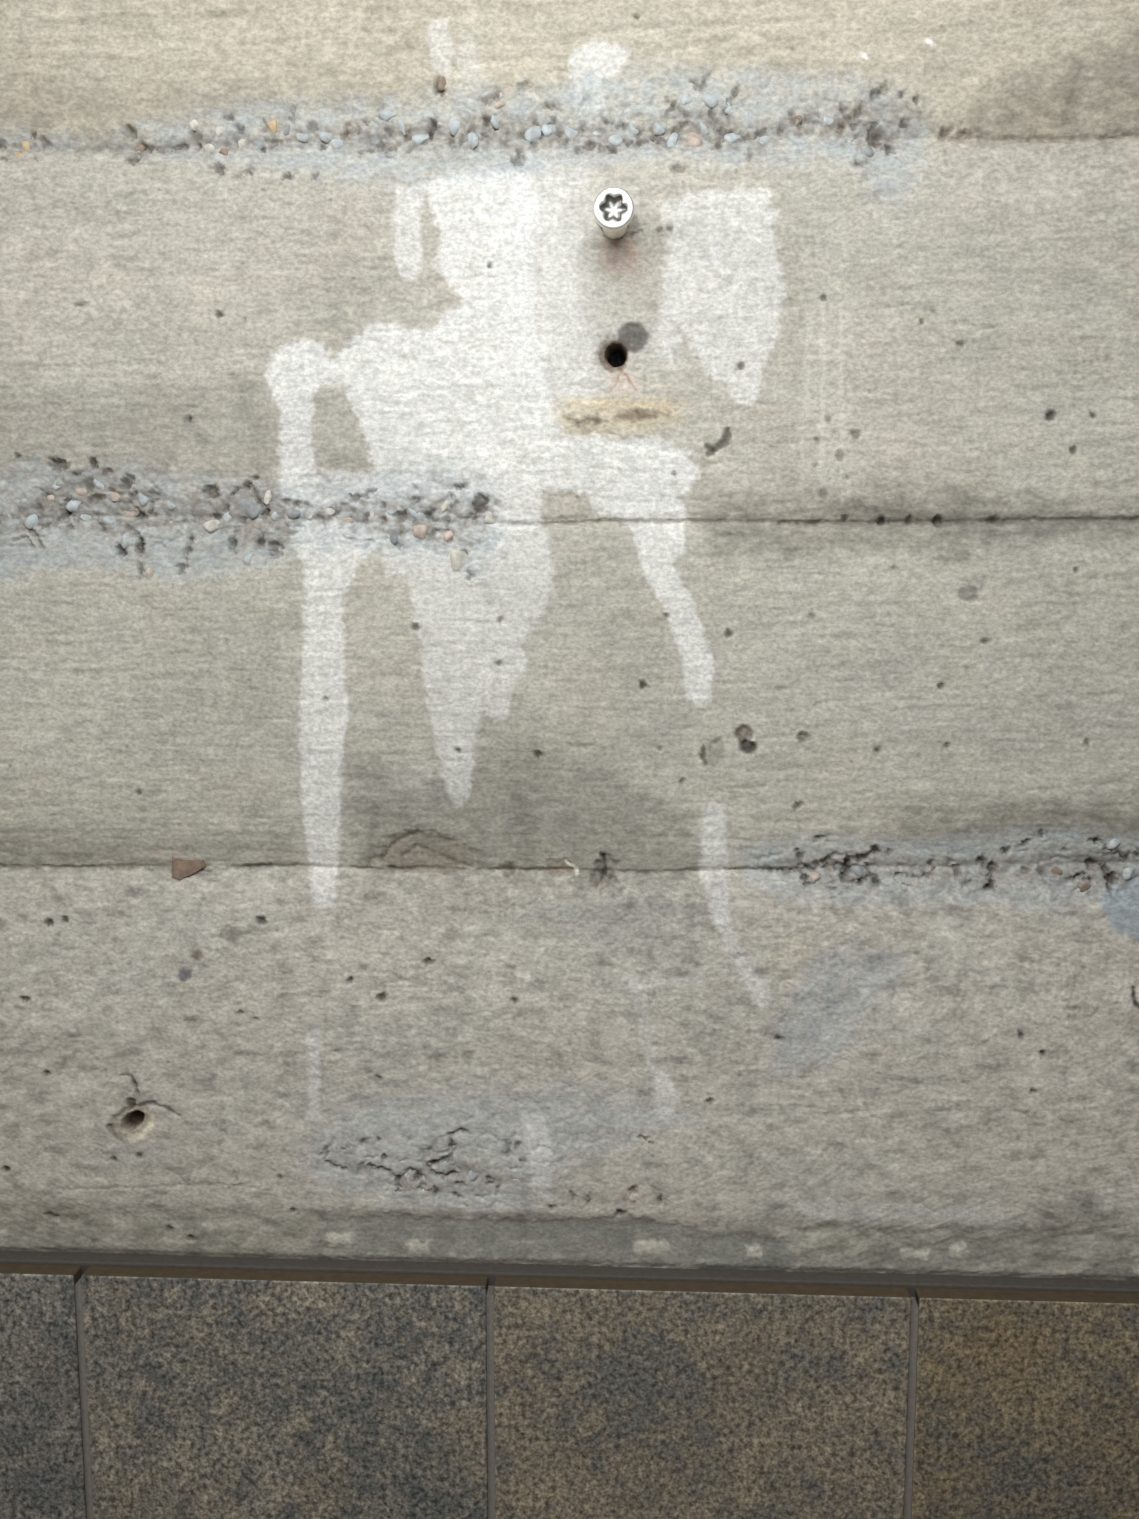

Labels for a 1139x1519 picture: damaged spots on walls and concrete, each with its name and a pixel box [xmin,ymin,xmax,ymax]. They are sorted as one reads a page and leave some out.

water stain [387,185,431,285]
water stain [481,166,696,434]
water stain [0,510,775,1078]